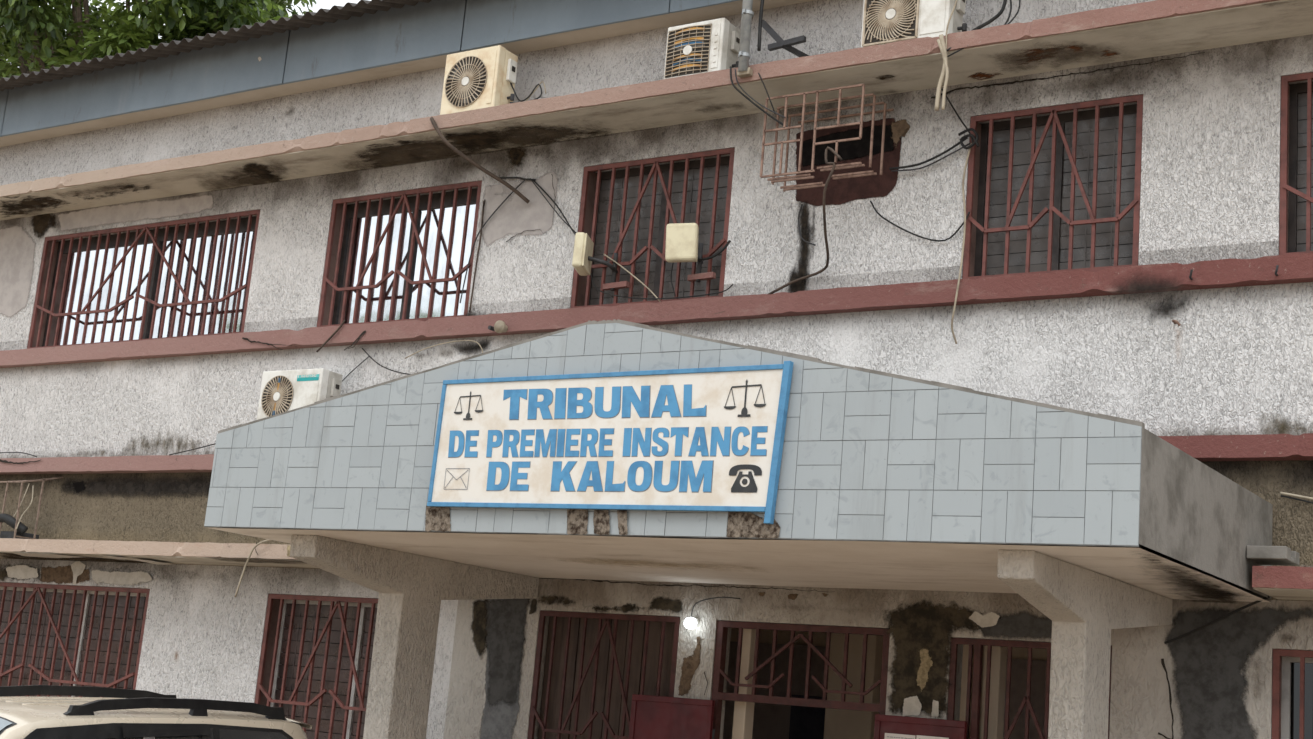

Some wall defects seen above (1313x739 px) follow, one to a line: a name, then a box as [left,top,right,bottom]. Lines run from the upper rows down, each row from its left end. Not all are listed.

damp [210,163,286,190]
damp [0,185,150,217]
damp [789,202,815,293]
peeling [425,506,451,532]
peeling [567,509,628,535]
peeling [727,512,780,539]
peeling [0,561,152,585]
damp [1145,557,1245,603]